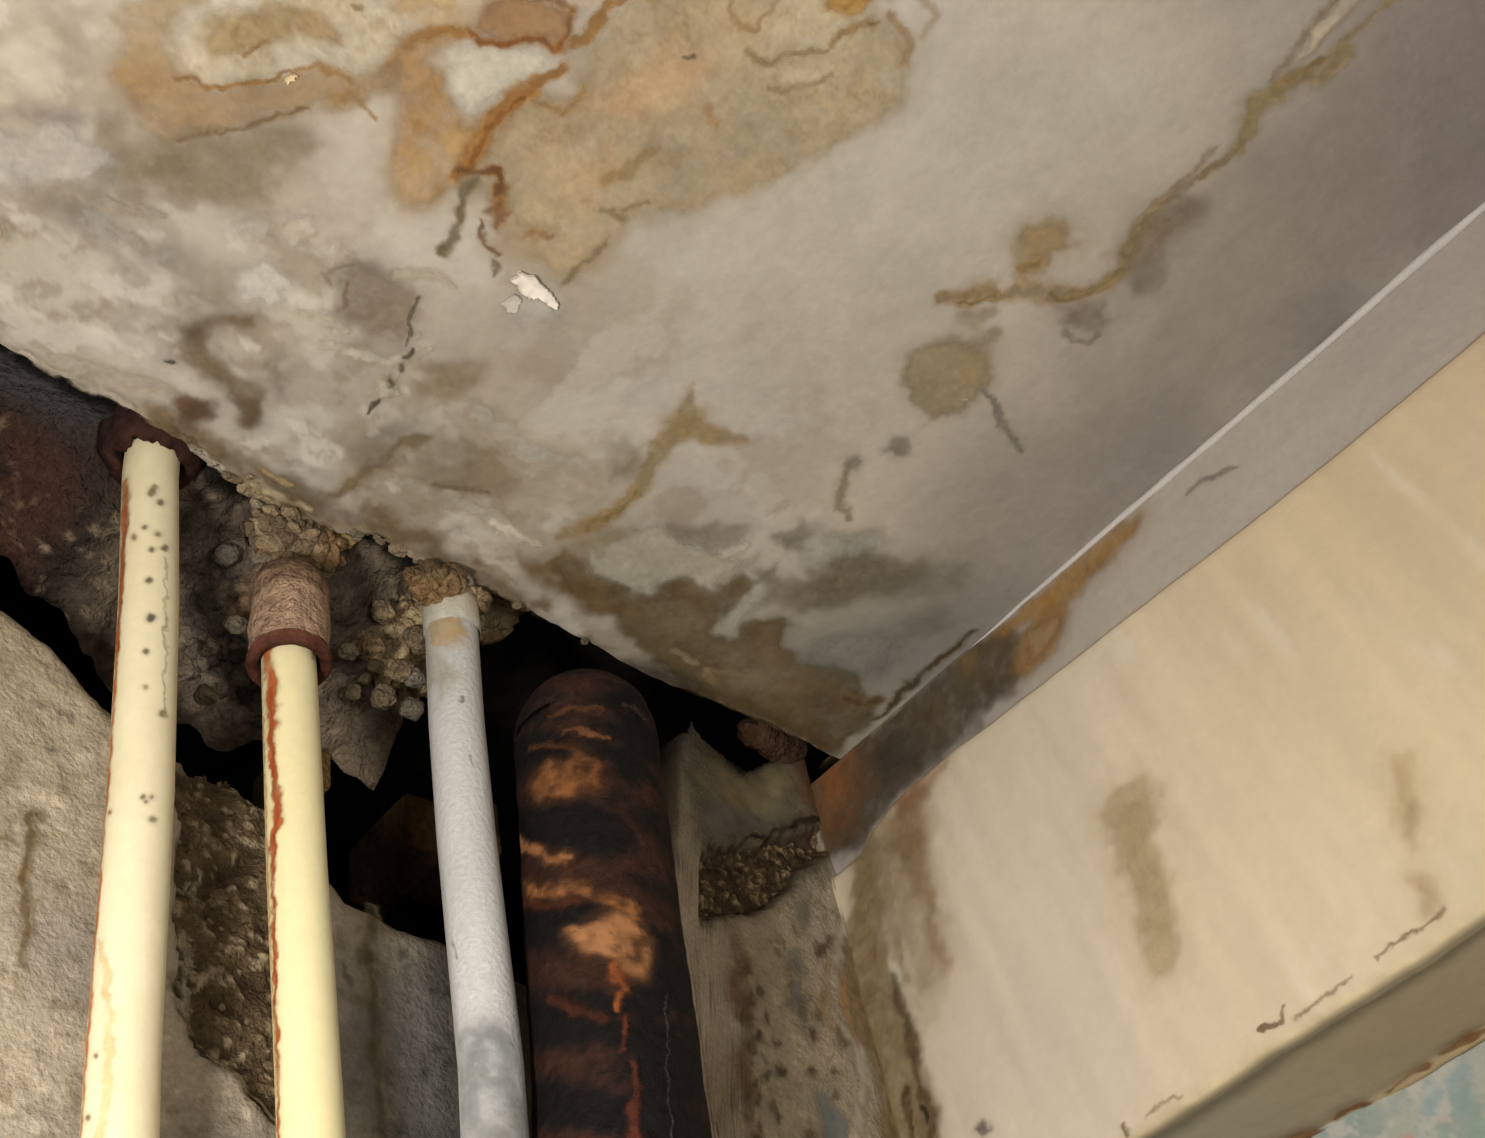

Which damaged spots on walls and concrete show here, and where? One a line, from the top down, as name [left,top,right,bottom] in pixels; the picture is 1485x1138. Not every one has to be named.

leakage [0,0,408,202]
leakage [180,317,261,429]
leakage [232,218,455,395]
peeling [500,271,559,322]
leakage [902,0,1395,453]
corrosion [997,518,1139,674]
spalling [0,344,863,1138]
leakage [330,393,1023,1138]
leakage [1111,793,1169,943]
peeling [792,917,871,1138]